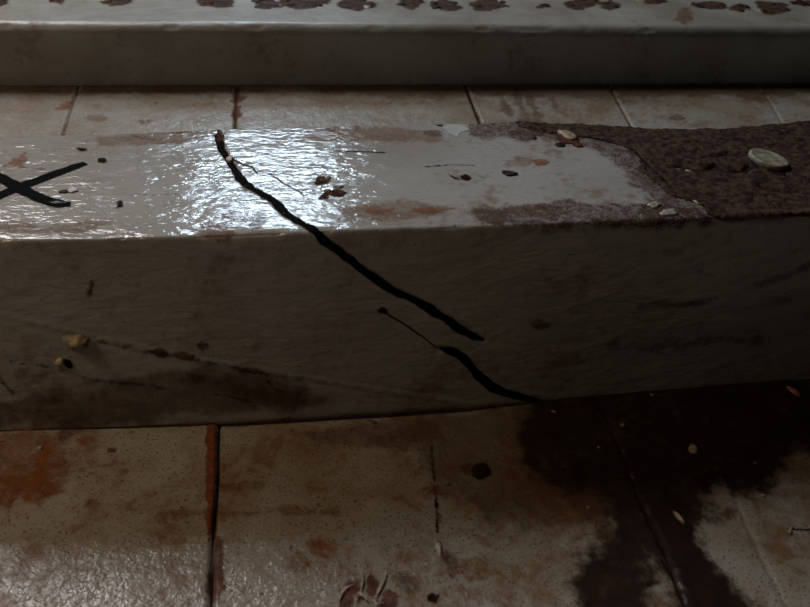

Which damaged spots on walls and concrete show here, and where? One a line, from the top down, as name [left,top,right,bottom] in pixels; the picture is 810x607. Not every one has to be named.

crack [212,129,541,402]
spalling [478,120,810,232]
corrosion [205,425,230,607]
water stain [519,379,810,607]